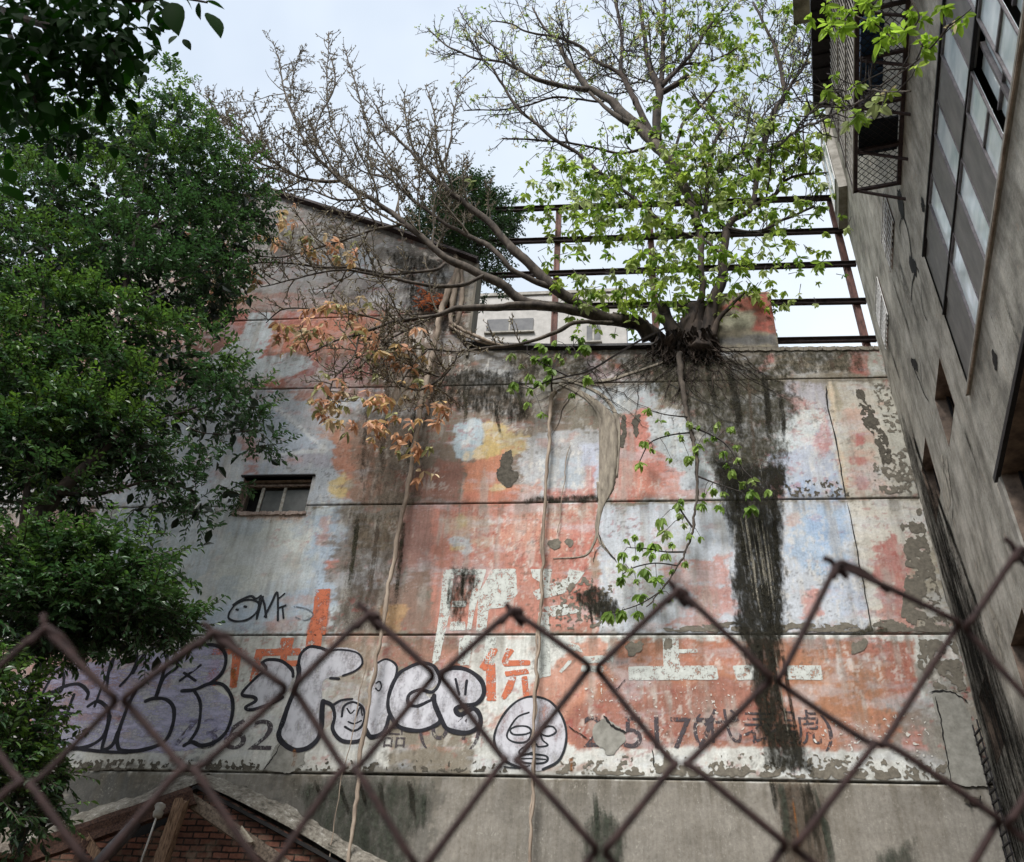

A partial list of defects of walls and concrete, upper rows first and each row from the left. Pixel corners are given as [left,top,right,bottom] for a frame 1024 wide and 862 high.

spalling [496,447,519,487]
peeling [856,383,916,494]
water stain [344,517,405,623]
water stain [362,350,863,862]
spalling [546,508,989,806]
peeling [64,758,193,771]
spalling [205,740,330,773]
peeling [348,759,507,772]
crack [930,689,968,780]
water stain [302,776,427,862]